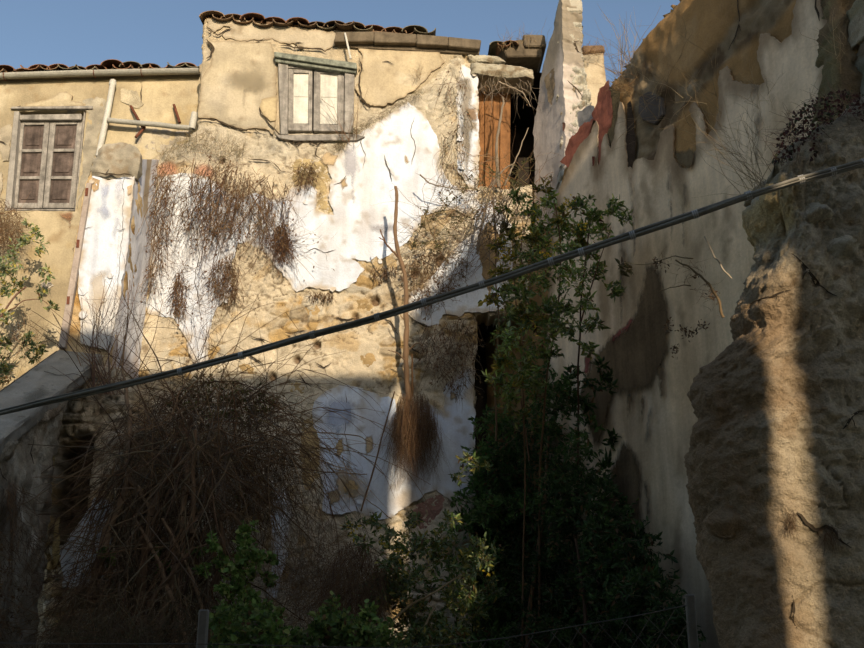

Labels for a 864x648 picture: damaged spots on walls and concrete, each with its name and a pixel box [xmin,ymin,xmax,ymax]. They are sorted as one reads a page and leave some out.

peeling [77,97,135,349]
spalling [135,127,191,152]
peeling [146,64,513,363]
spalling [560,80,636,169]
spalling [360,353,376,367]
peeling [299,368,476,529]